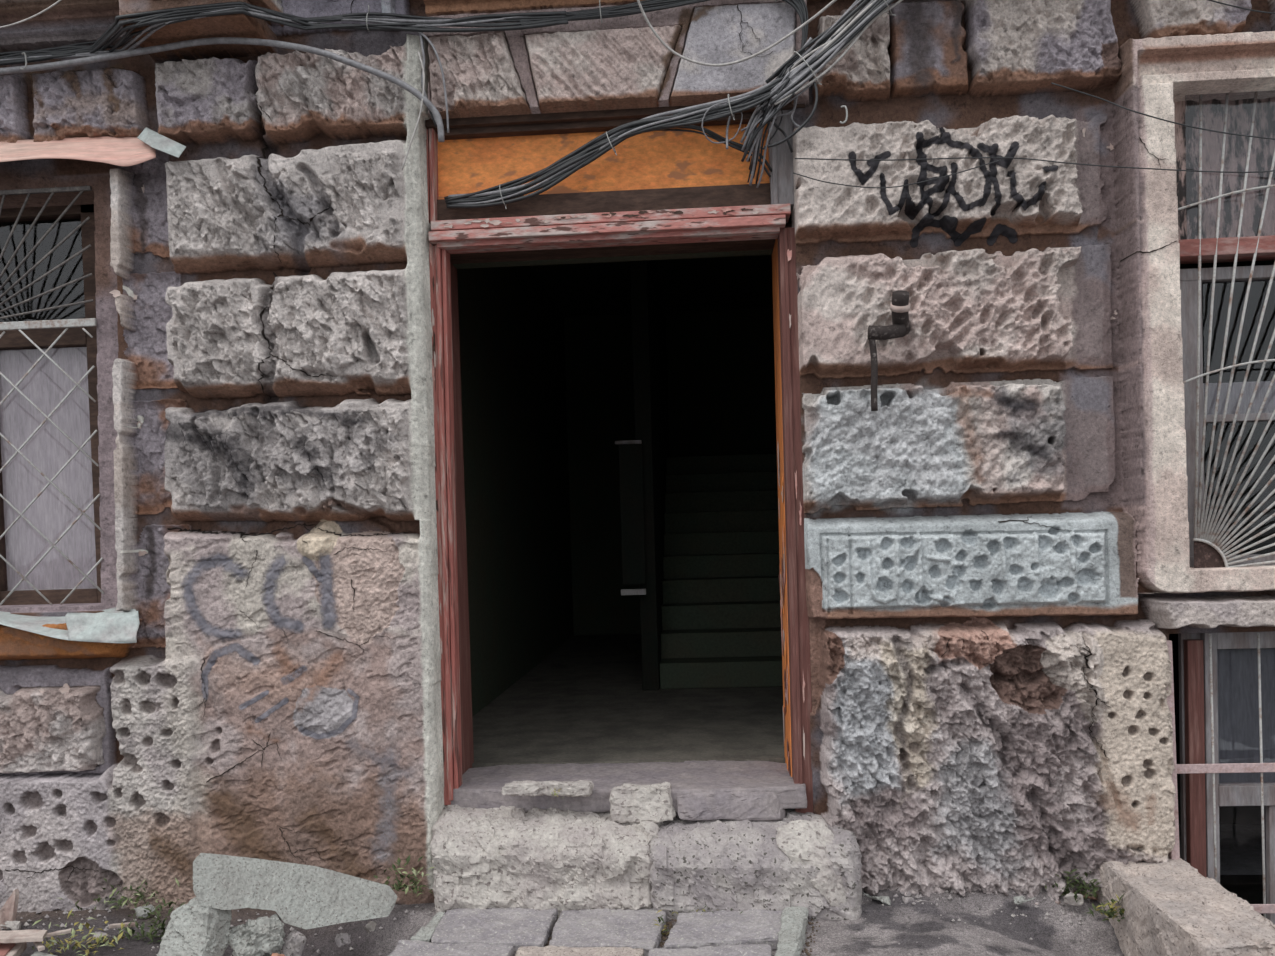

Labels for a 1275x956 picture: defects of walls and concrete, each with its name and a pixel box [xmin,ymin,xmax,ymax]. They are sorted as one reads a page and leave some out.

peeling [444,218,520,228]
peeling [602,210,683,218]
peeling [777,443,805,774]
spalling [803,566,846,716]
spalling [934,616,1070,715]
spalling [58,856,124,908]